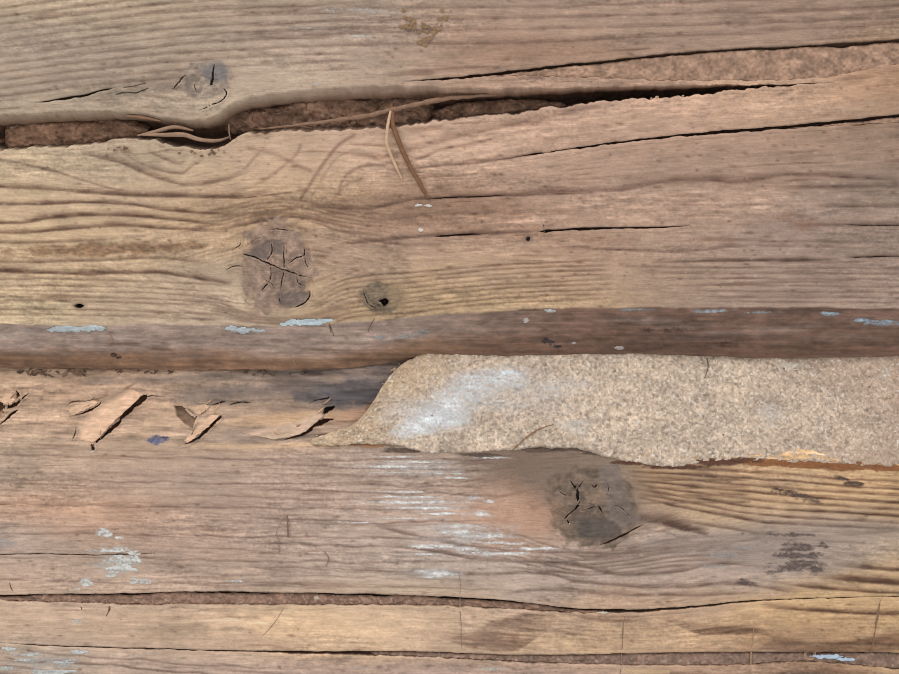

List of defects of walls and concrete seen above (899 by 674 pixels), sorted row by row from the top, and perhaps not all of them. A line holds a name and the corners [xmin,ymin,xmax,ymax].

crack [0,34,899,155]
crack [497,110,899,164]
crack [432,230,488,241]
crack [538,222,690,237]
peeling [0,393,15,415]
peeling [68,388,143,443]
spalling [172,404,219,443]
peeling [242,411,324,440]
crack [0,583,899,618]
crack [0,639,899,674]